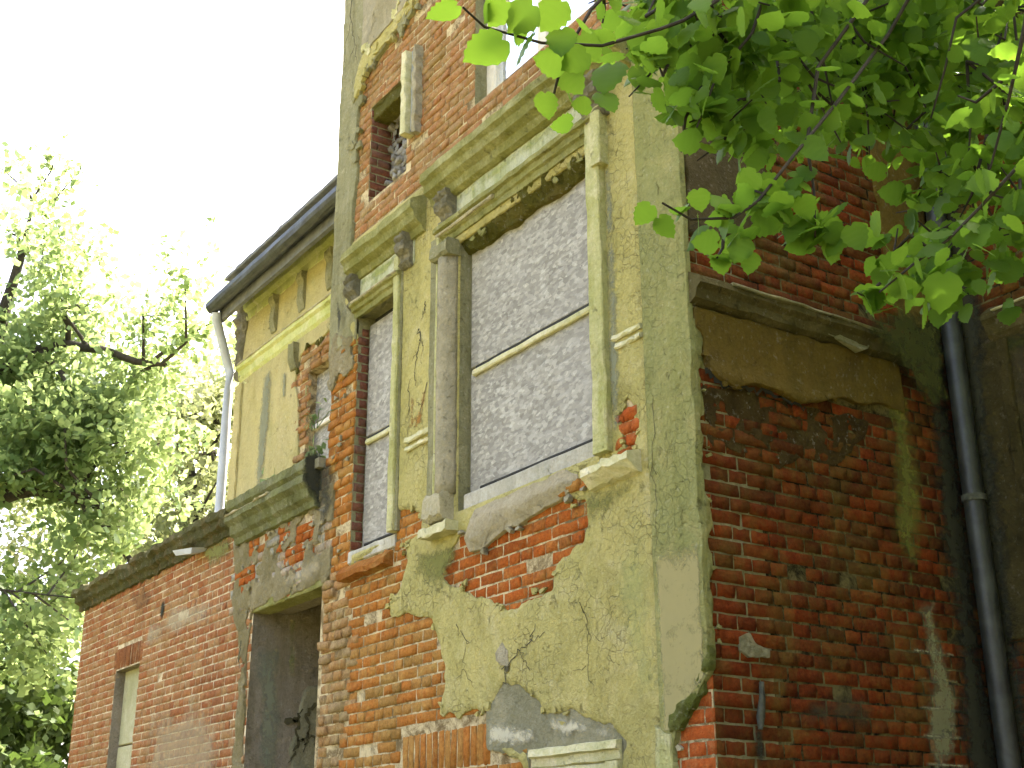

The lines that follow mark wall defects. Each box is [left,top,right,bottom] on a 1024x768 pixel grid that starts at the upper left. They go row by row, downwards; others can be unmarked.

peeling [569,0,629,36]
peeling [347,0,549,240]
crack [407,301,427,437]
spalling [615,405,640,454]
peeling [235,323,527,768]
peeling [443,478,588,611]
peeling [654,306,905,768]
water stain [914,338,998,768]
crack [499,624,545,685]
crack [284,703,317,763]